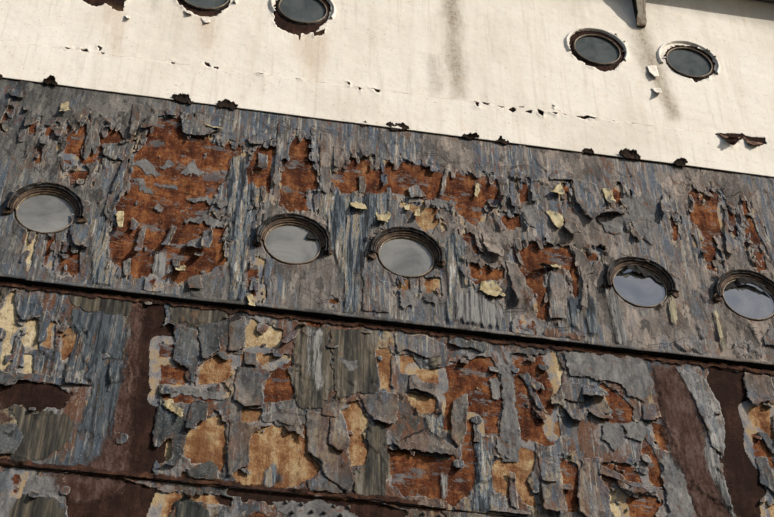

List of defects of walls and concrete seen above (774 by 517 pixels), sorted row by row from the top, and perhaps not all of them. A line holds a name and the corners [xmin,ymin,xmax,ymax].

rust [83,0,126,11]
rust [273,0,331,35]
rust [43,75,58,86]
rust [172,93,194,105]
rust [217,99,238,110]
peeling [459,233,527,300]
peeling [0,290,99,385]
rust [0,112,774,517]
peeling [519,350,613,421]
peeling [675,367,725,454]
peeling [152,399,362,493]
peeling [577,457,662,517]